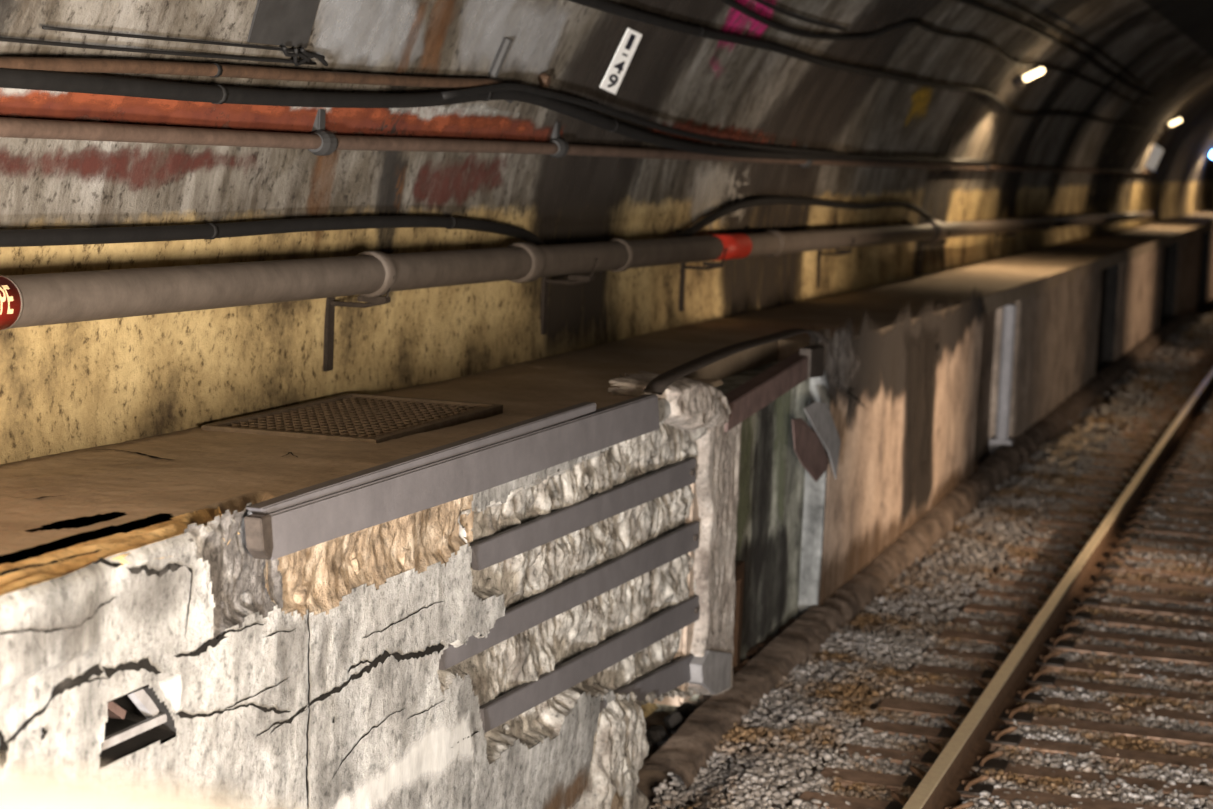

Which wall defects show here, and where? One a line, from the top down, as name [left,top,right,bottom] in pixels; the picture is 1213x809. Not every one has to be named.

spalling [0,417,708,639]
spalling [99,685,176,767]
crack [0,549,296,743]
crack [176,601,445,736]
crack [333,700,445,777]
spalling [437,549,696,707]
spalling [484,628,705,765]